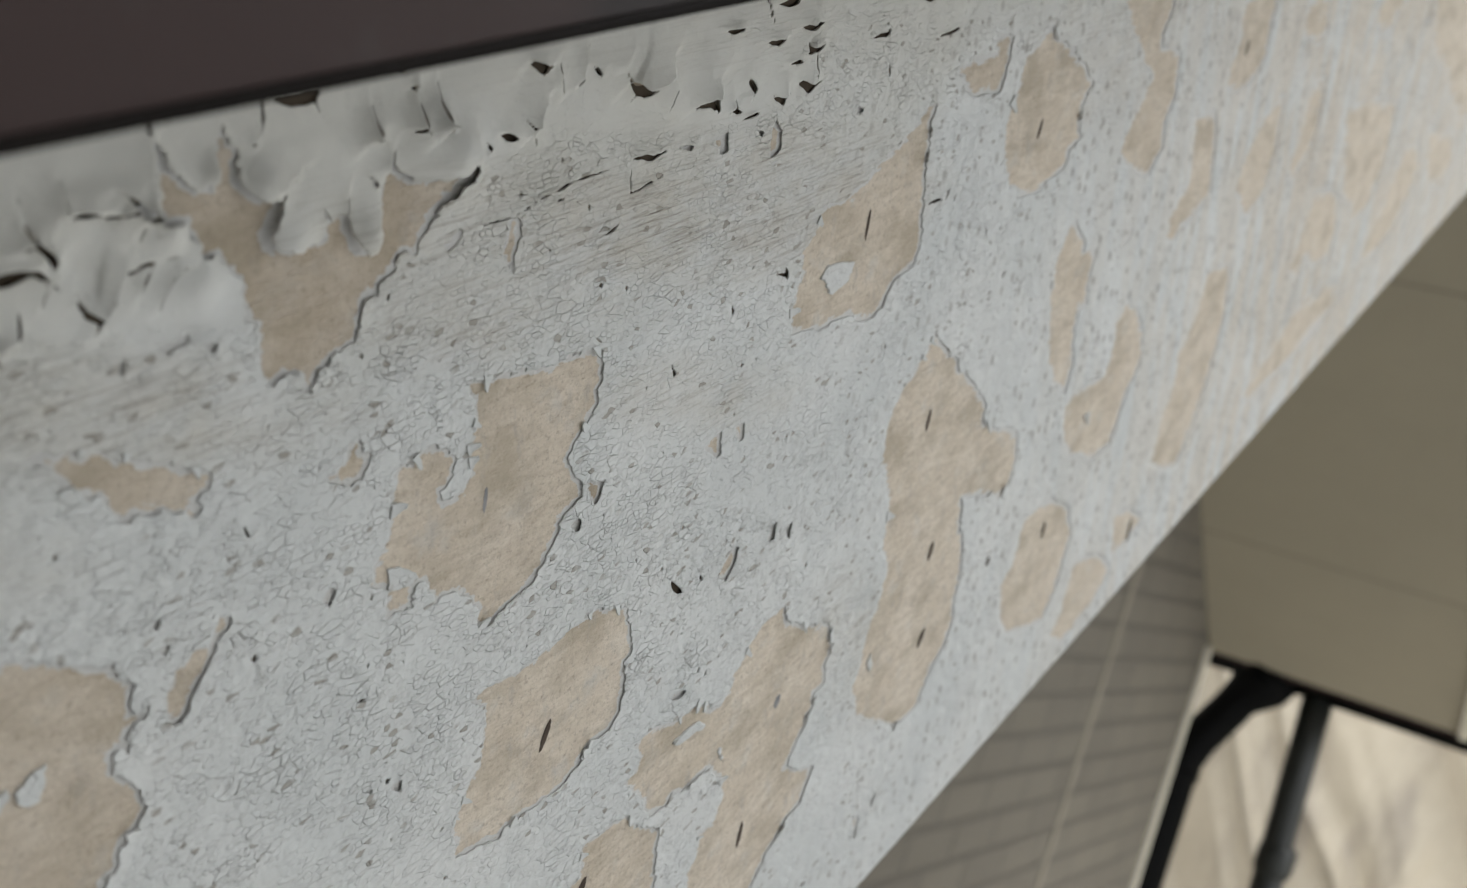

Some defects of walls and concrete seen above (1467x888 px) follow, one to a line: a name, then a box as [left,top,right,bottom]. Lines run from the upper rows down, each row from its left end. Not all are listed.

peeling [137,117,484,394]
spalling [716,132,728,154]
spalling [759,121,782,157]
peeling [789,101,938,336]
peeling [957,25,1093,198]
peeling [26,450,212,524]
peeling [369,345,605,629]
peeling [851,334,1018,732]
peeling [998,497,1142,644]
peeling [0,616,231,888]
peeling [451,604,632,858]
peeling [569,607,834,888]